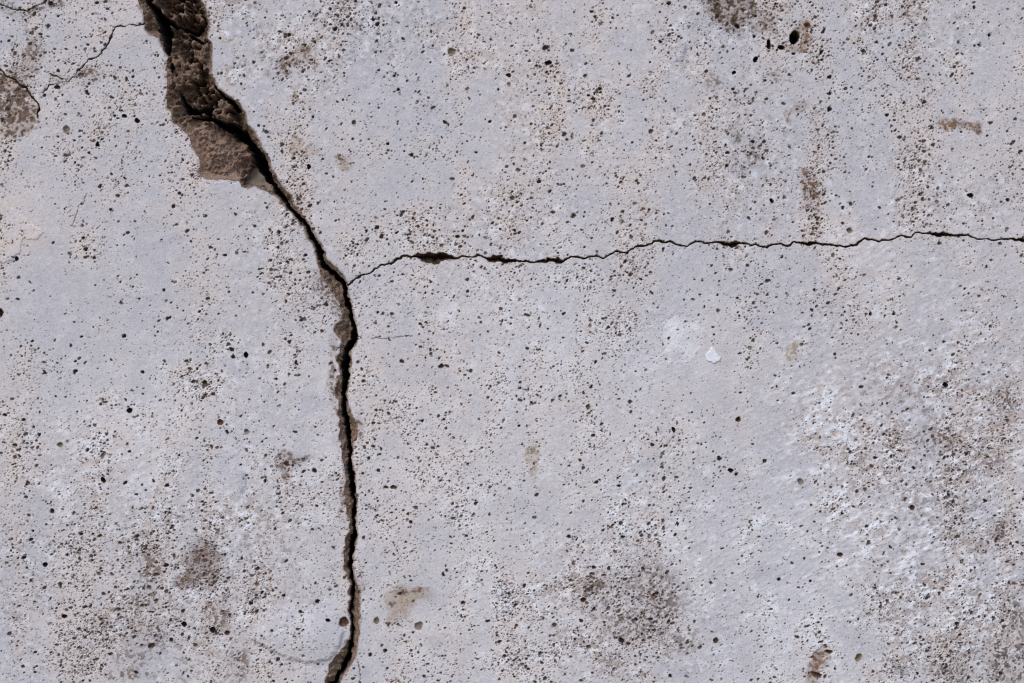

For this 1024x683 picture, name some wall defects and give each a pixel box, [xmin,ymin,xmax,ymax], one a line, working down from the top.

crack [0,0,47,12]
crack [50,25,126,83]
crack [348,231,1024,286]
crack [131,0,361,683]